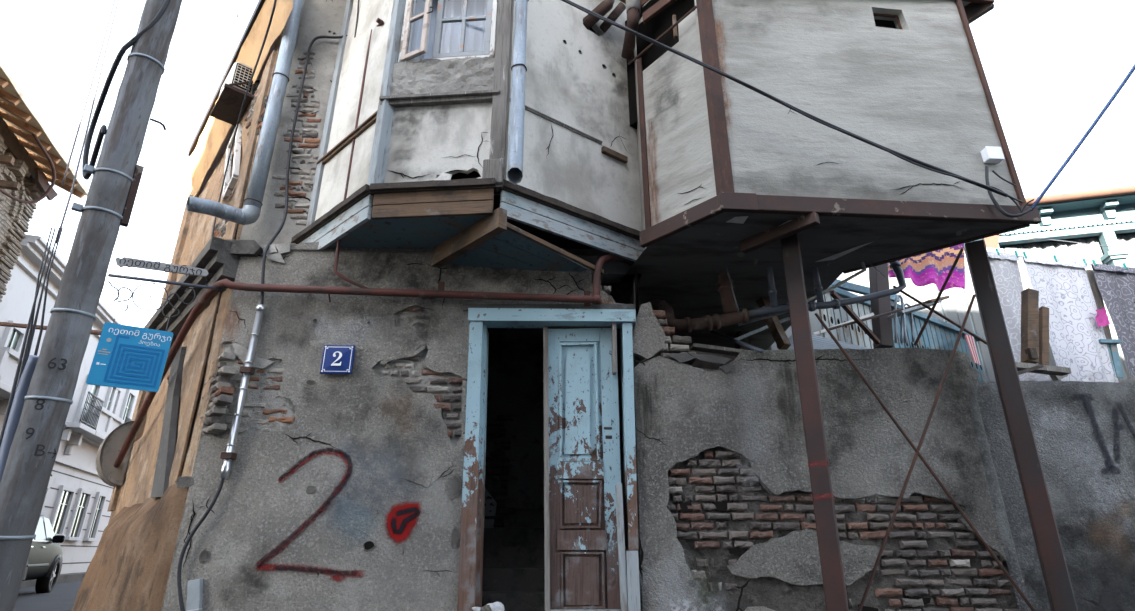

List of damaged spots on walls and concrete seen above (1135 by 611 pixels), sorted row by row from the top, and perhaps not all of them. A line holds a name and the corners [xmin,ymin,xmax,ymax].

spalling [272,51,321,226]
flaking render [436,170,463,180]
crack [451,132,489,168]
crack [891,181,967,194]
crack [535,272,592,295]
spalling [195,342,296,438]
spalling [373,343,467,447]
spalling [667,447,826,611]
spalling [834,494,1025,611]